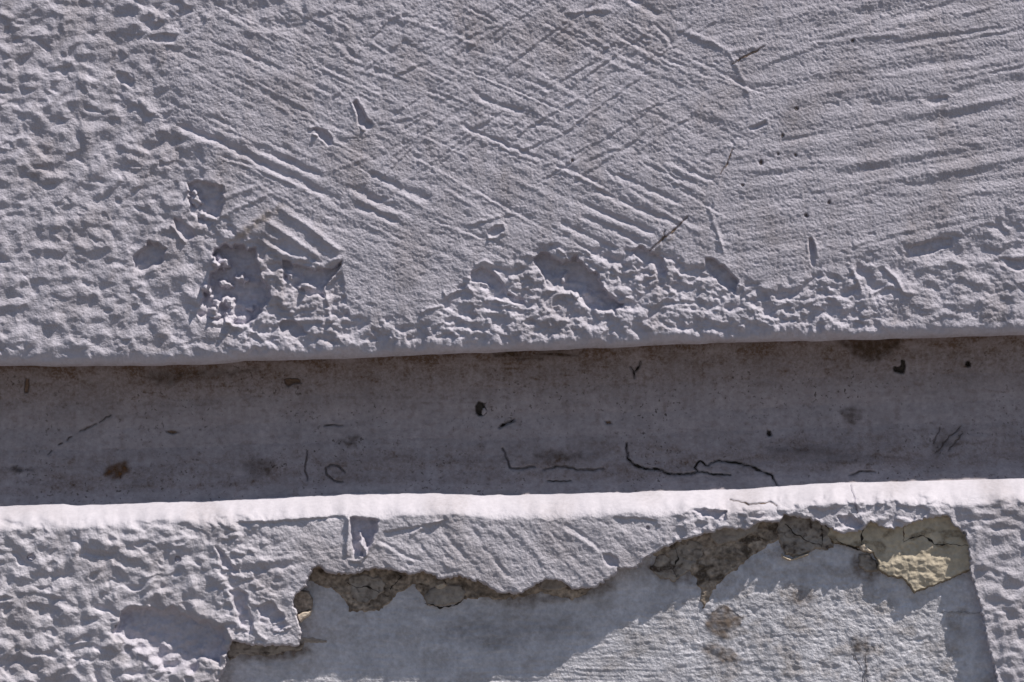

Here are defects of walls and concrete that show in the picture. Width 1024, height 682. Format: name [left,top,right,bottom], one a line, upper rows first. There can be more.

crack [502,448,604,482]
crack [626,443,777,506]
peeling [113,509,997,682]